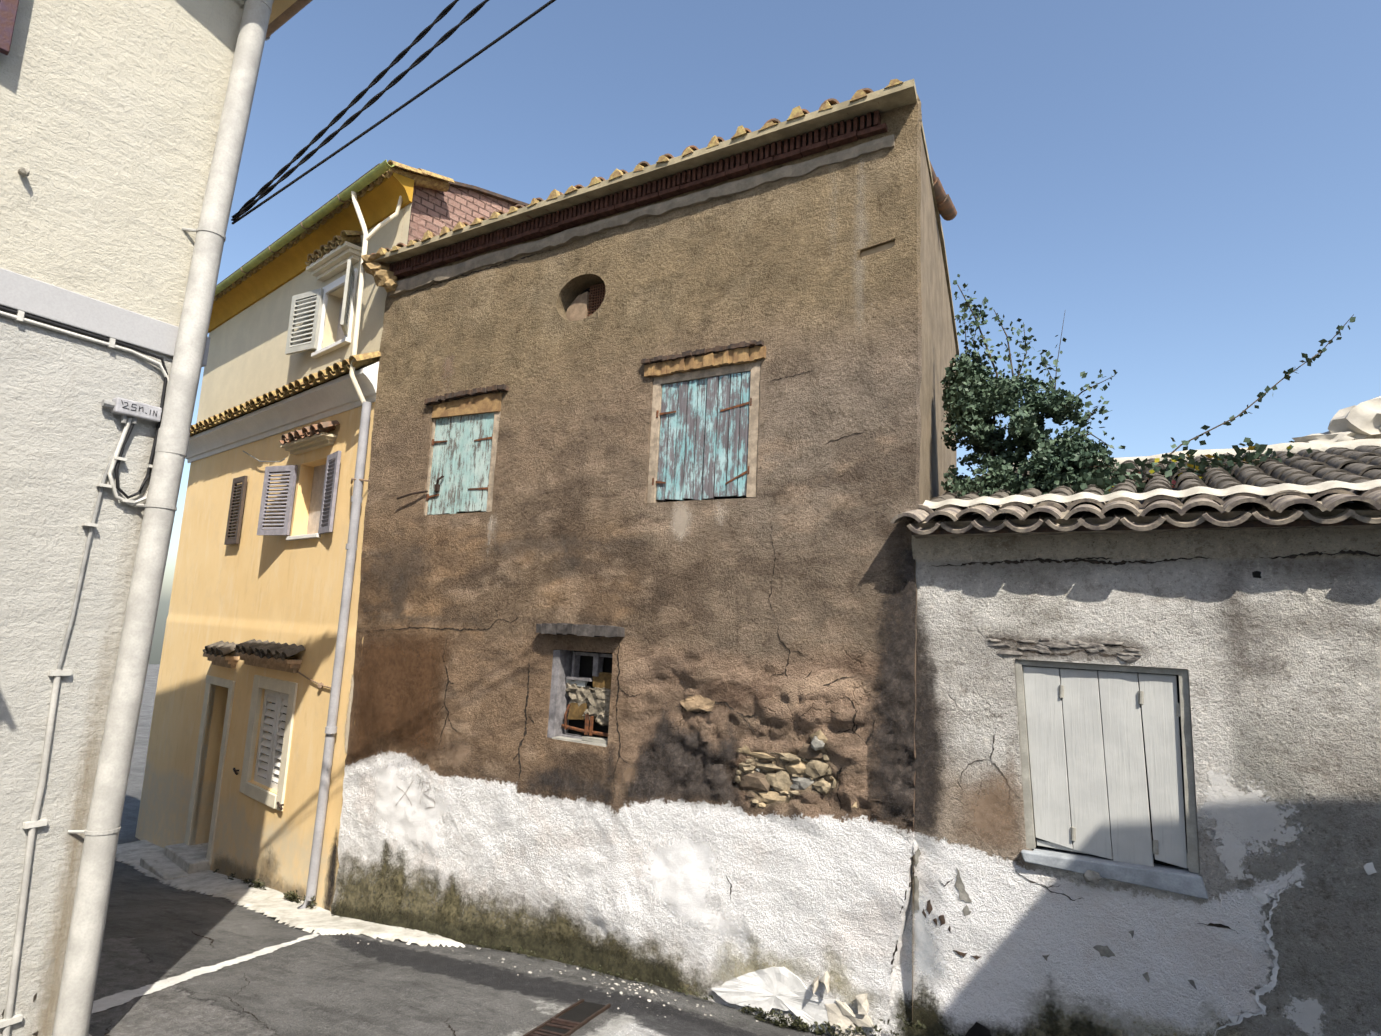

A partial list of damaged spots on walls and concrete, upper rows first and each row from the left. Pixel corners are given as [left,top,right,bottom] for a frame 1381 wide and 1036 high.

crack [366,609,534,791]
spalling [676,695,715,714]
water stain [867,544,942,832]
spalling [734,730,837,807]
crack [831,767,843,812]
water stain [439,877,462,925]
water stain [545,907,579,941]
spalling [912,848,951,933]
spalling [955,869,972,916]
peeling [1214,873,1305,1036]
water stain [1043,996,1106,1036]
water stain [1271,994,1338,1036]